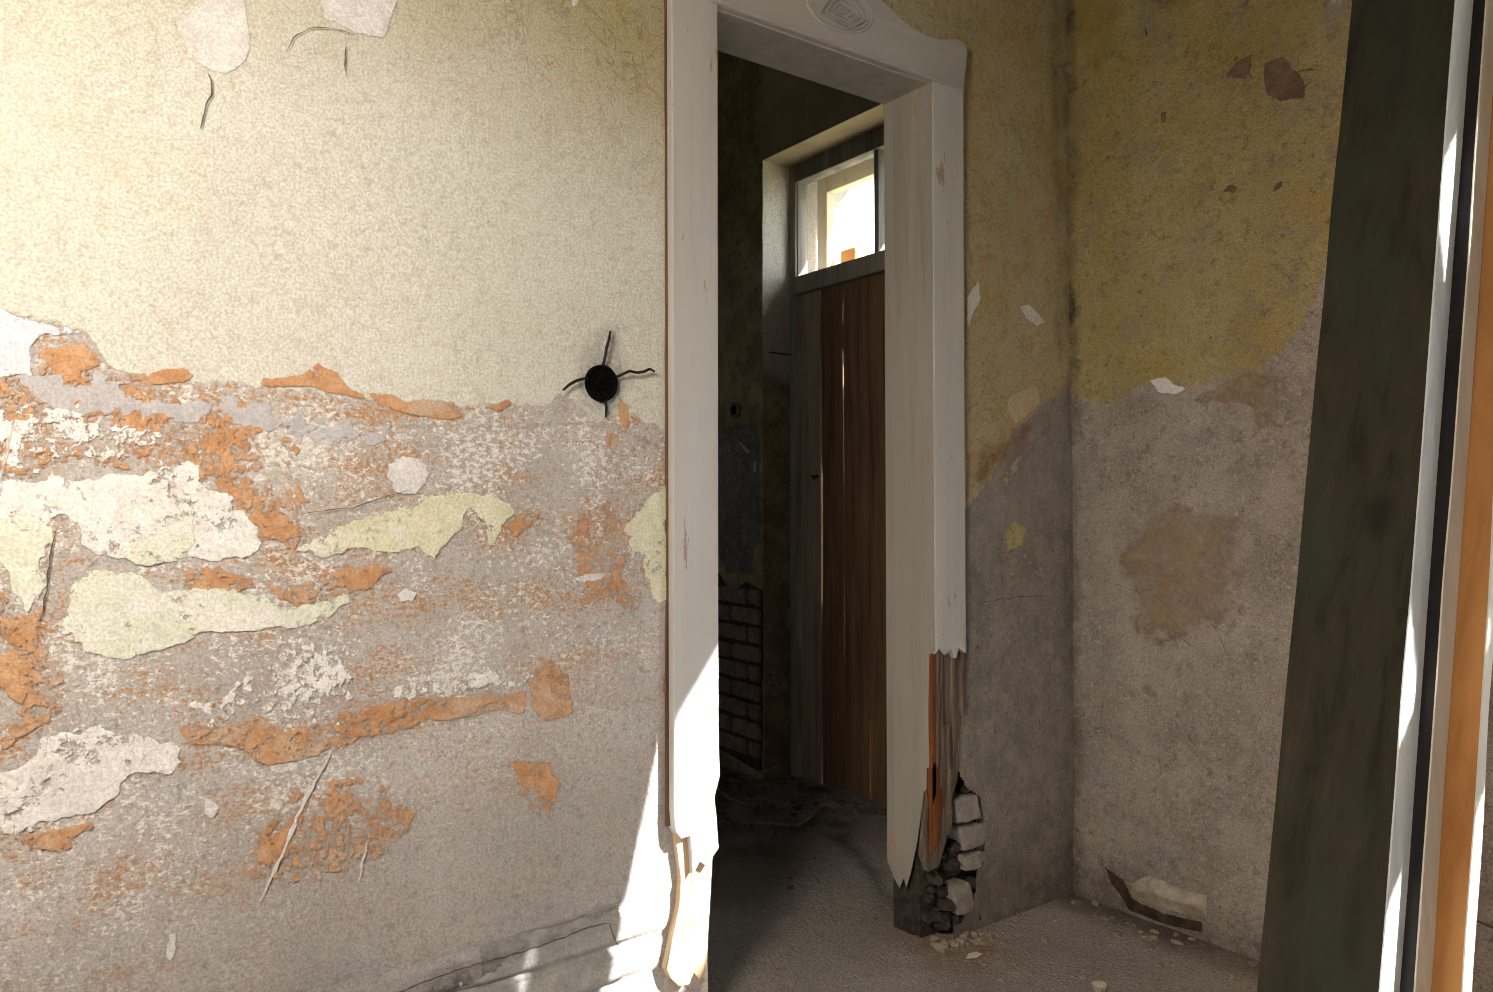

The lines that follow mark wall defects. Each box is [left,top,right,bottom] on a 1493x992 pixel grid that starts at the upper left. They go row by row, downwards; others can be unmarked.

peeling [175,0,250,74]
peeling [321,0,398,38]
peeling [0,307,573,852]
peeling [556,486,666,614]
spalling [249,776,419,889]
peeling [166,933,176,960]
spalling [453,906,630,992]